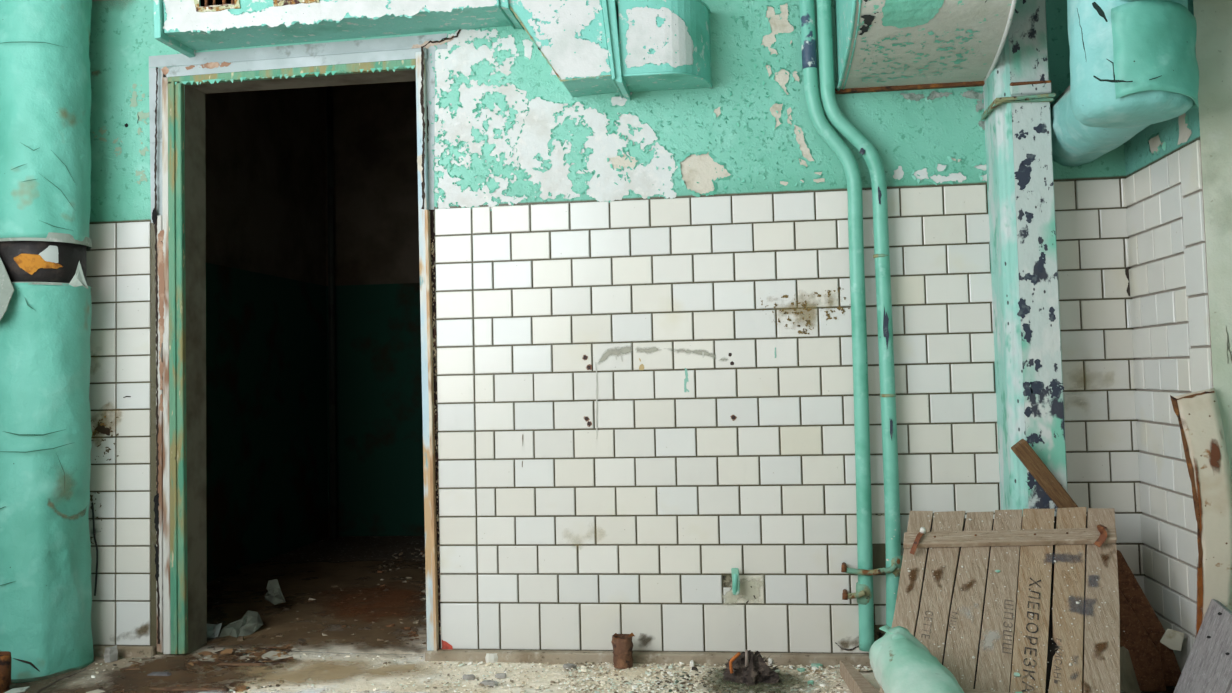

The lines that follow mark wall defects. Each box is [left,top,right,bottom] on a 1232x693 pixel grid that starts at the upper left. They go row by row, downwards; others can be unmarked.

peeling [163,0,497,33]
peeling [859,0,879,35]
peeling [175,65,415,85]
peeling [429,0,733,211]
peeling [1015,123,1045,140]
peeling [1014,154,1036,191]
peeling [1024,252,1046,286]
peeling [1017,298,1033,343]
peeling [1023,359,1064,417]
peeling [1026,433,1045,444]